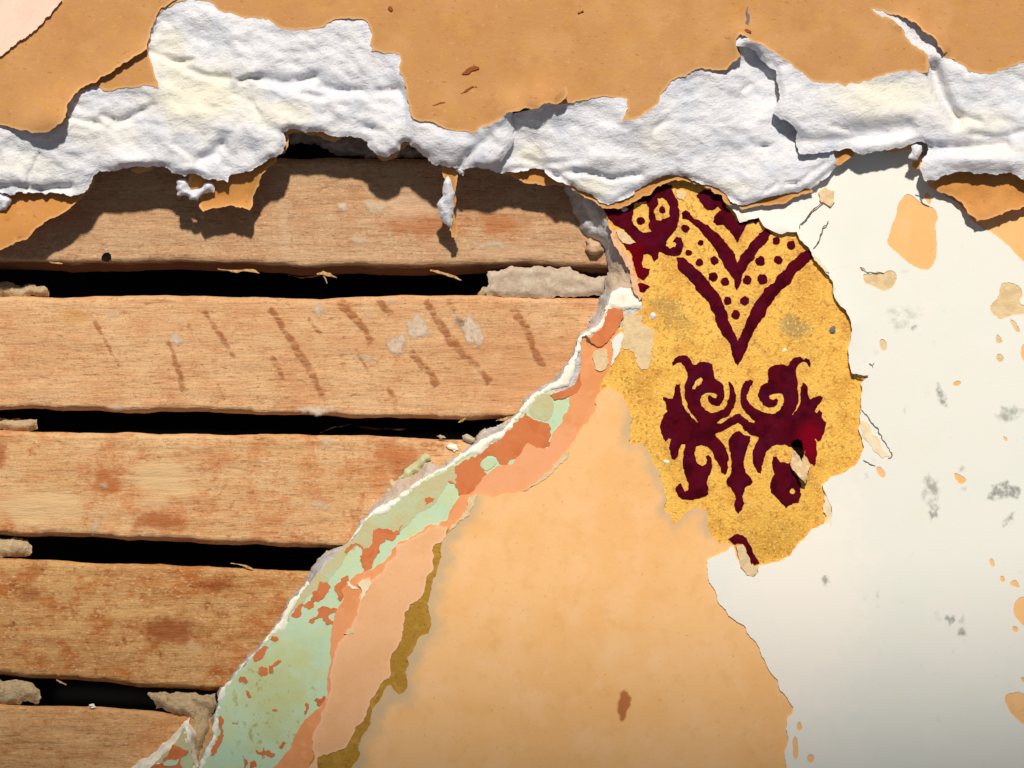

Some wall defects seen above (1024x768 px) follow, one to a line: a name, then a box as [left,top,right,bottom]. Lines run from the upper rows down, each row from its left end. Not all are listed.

peeling [199,371,582,768]
peeling [589,308,624,366]
peeling [707,144,1024,768]